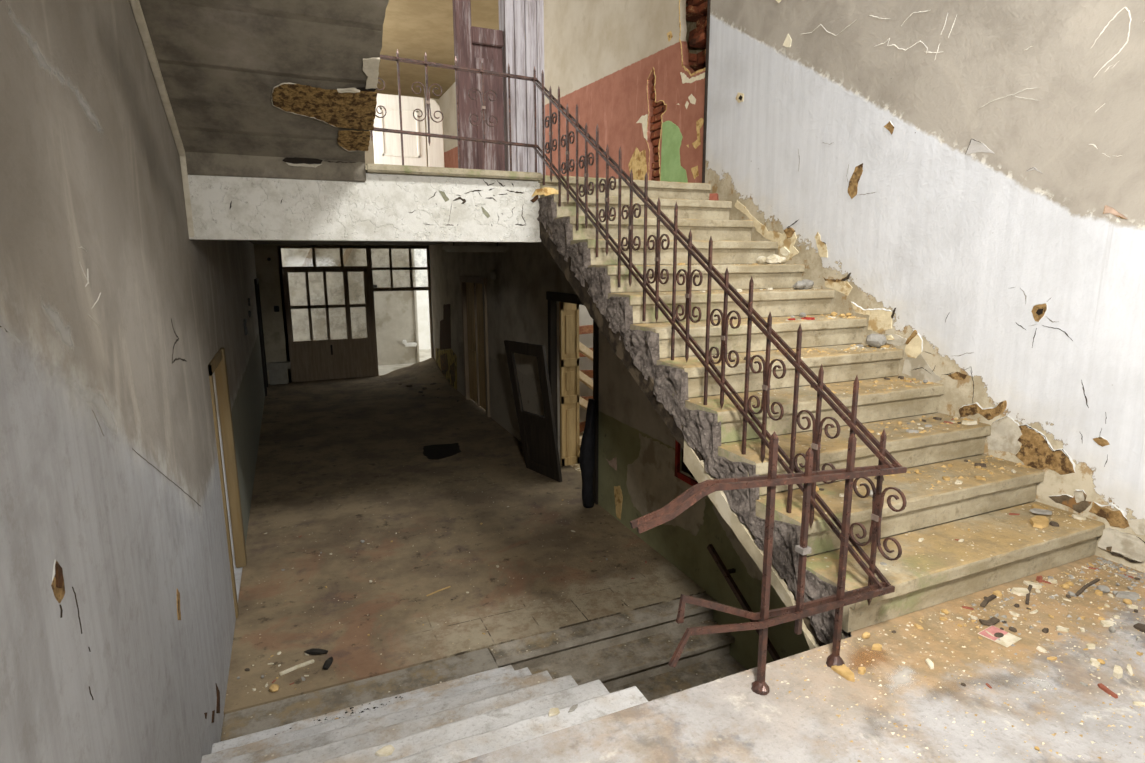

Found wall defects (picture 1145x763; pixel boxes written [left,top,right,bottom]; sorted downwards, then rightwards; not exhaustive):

flaking render [271,57,380,151]
spalling [628,0,708,183]
flaking render [847,163,875,199]
spalling [1015,298,1073,347]
flaking render [875,400,1076,489]
flaking render [1093,412,1110,447]
spalling [51,559,65,618]